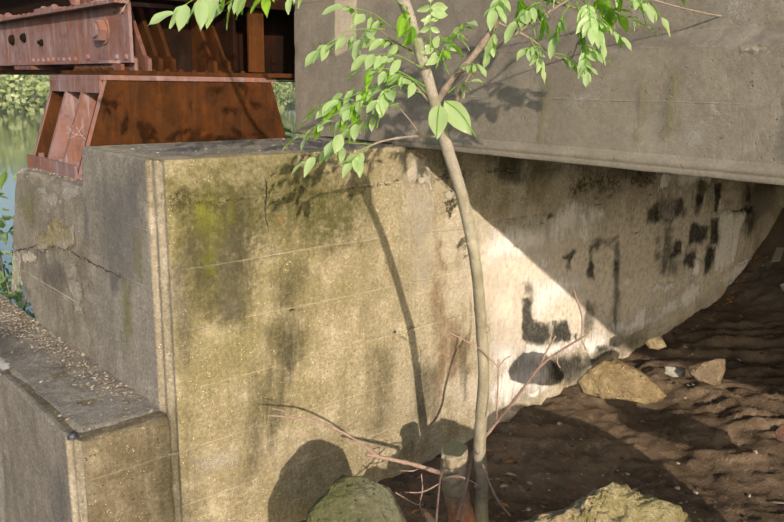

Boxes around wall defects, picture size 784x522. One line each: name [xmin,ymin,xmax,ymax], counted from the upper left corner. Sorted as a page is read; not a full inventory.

crack [262,177,270,230]
leakage [312,192,352,237]
spalling [11,189,77,304]
crack [11,234,122,278]
leakage [189,208,244,305]
spalling [66,263,82,312]